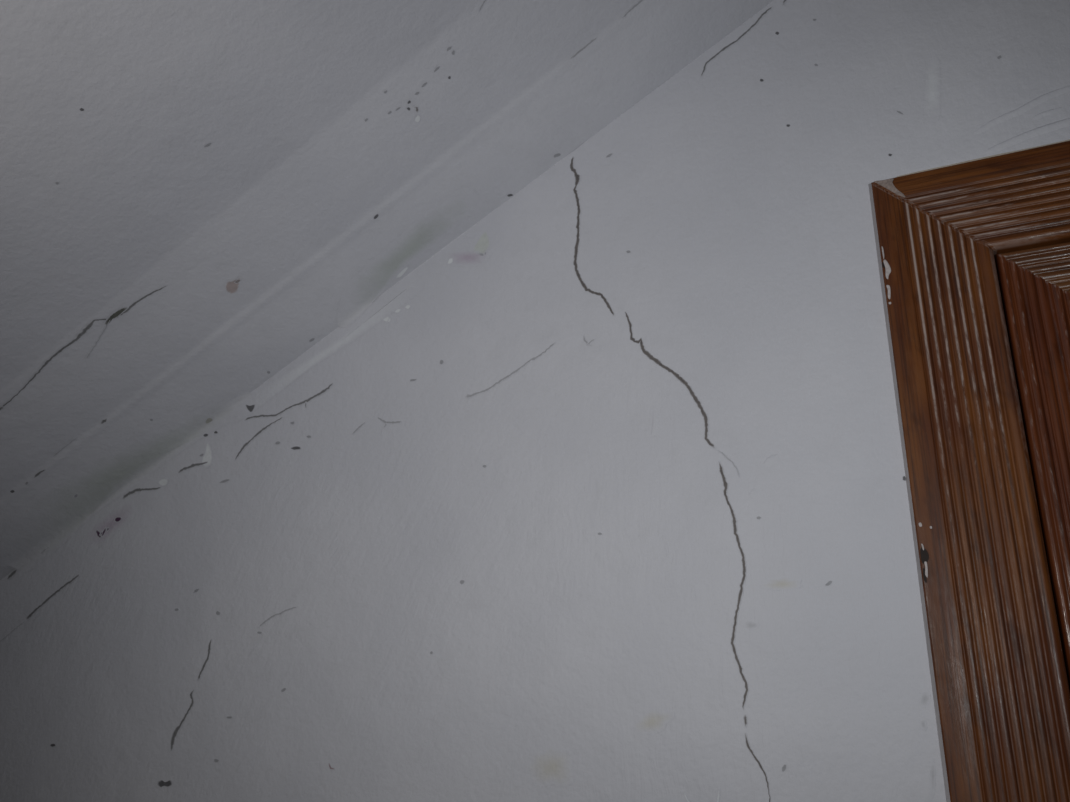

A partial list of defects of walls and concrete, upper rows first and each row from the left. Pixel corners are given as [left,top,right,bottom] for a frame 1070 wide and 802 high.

crack [700,0,787,77]
crack [0,285,168,411]
crack [465,341,556,399]
crack [121,383,333,500]
crack [569,156,771,802]
crack [170,638,212,751]
crack [156,779,174,788]